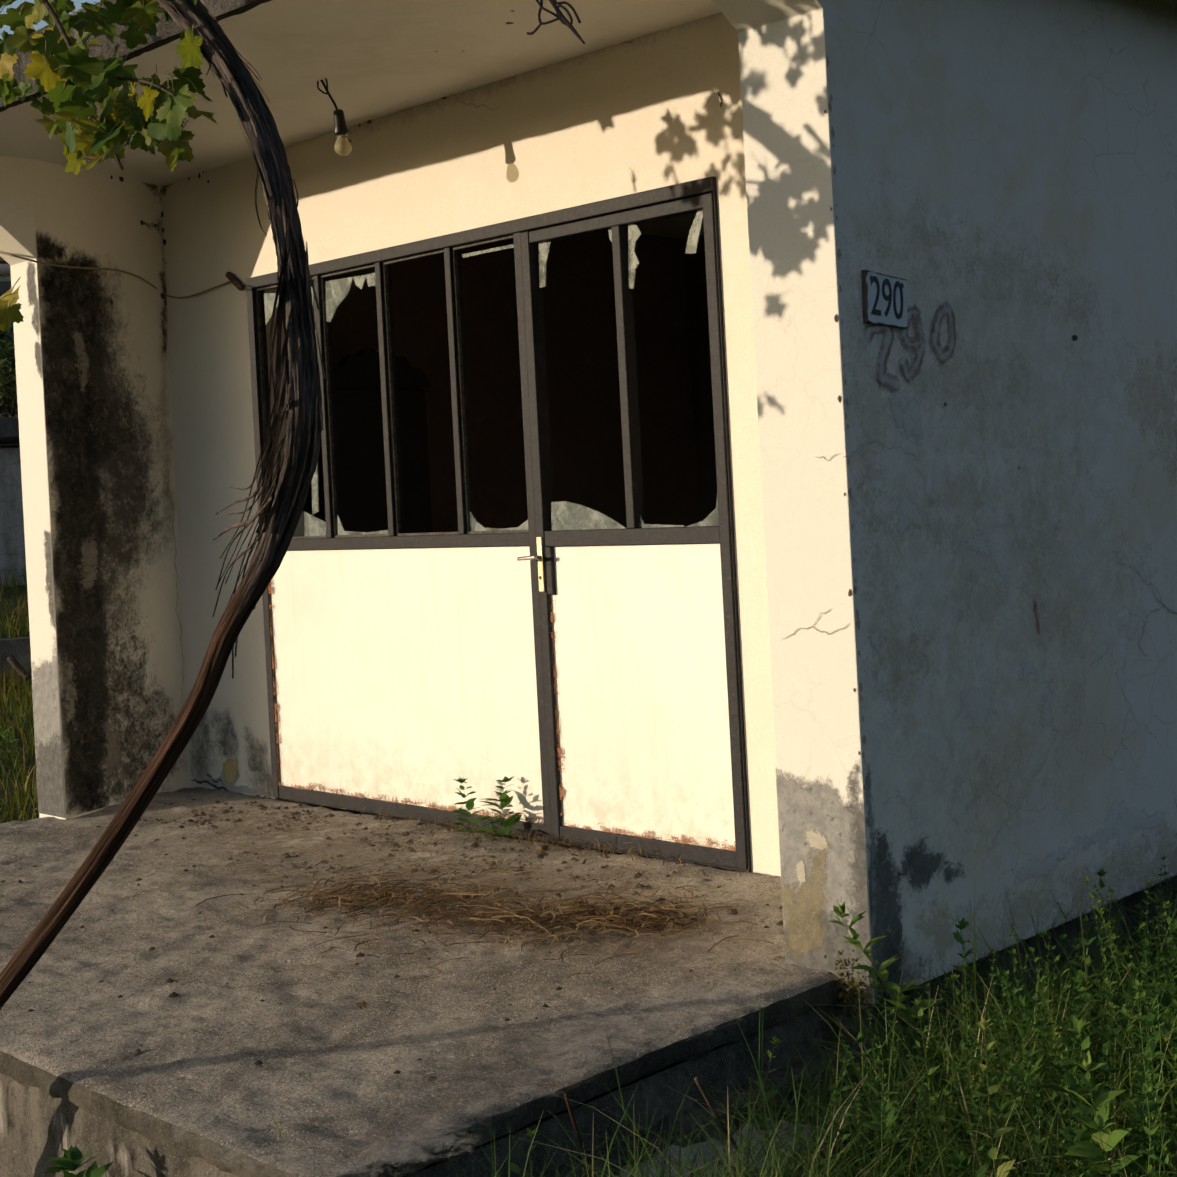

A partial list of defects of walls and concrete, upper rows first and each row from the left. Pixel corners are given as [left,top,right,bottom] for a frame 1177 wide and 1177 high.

water stain [140,183,173,352]
water stain [32,233,173,818]
corrosion [268,581,544,825]
crack [782,609,848,639]
water stain [775,764,964,1004]